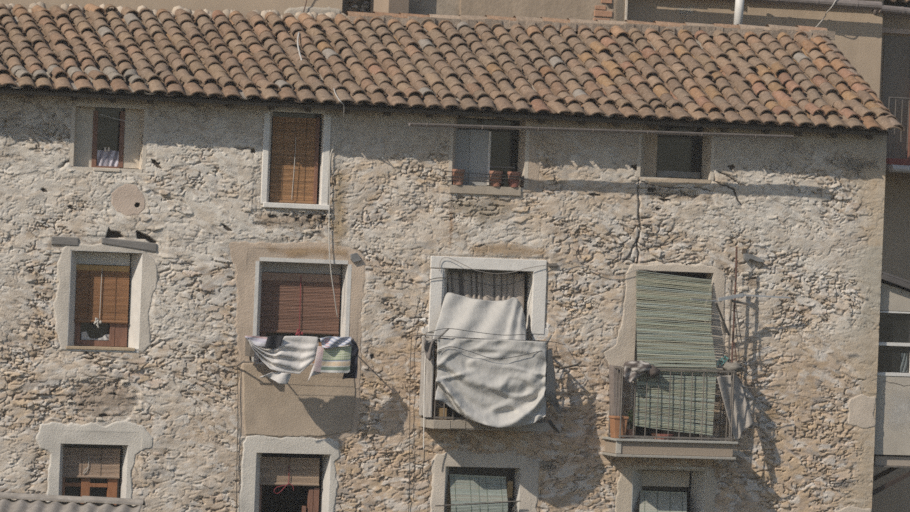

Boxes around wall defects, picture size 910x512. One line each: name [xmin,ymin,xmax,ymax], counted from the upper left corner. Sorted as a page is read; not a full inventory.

crack [625,171,744,265]